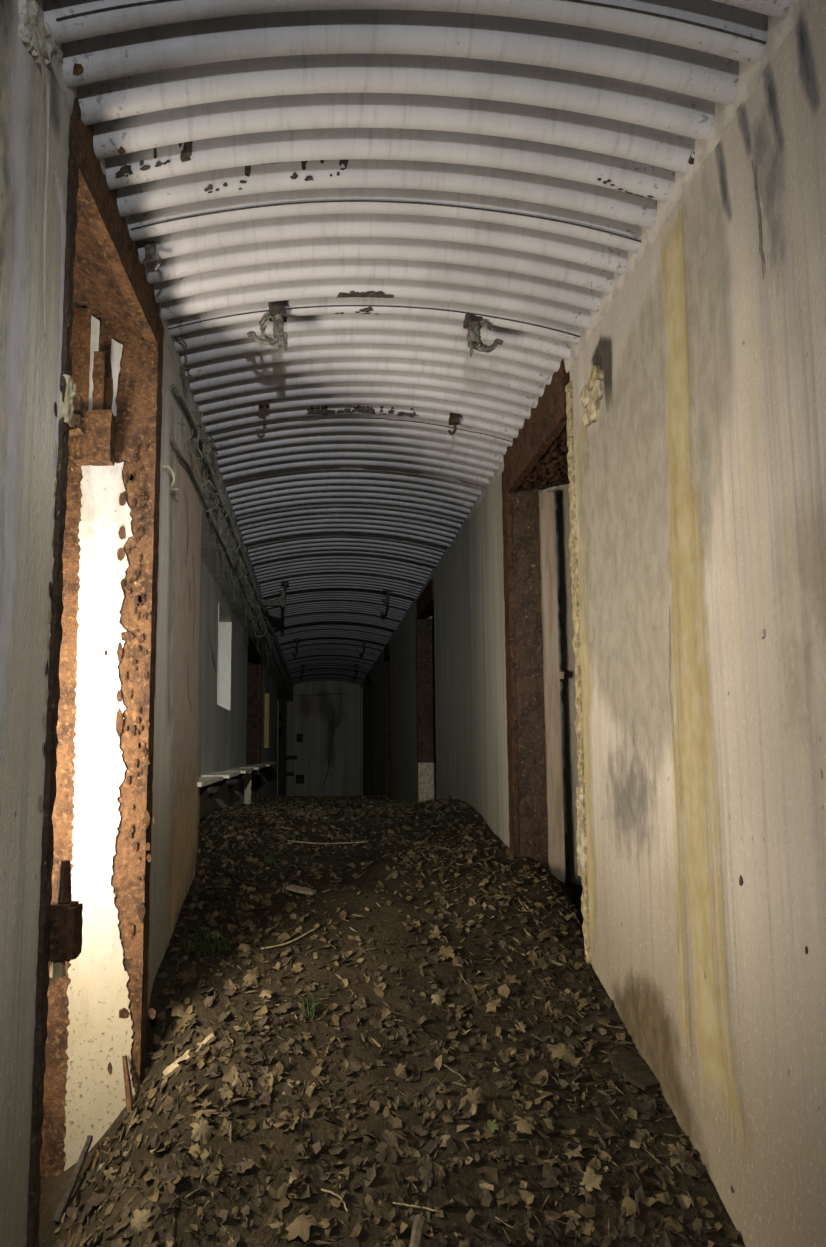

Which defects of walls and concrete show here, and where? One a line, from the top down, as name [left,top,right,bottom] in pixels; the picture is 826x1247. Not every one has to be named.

leakage [796,20,817,107]
peeling [115,141,192,178]
peeling [204,159,348,193]
leakage [716,143,730,217]
leakage [738,71,782,245]
peeling [88,315,123,416]
peeling [43,479,57,758]
leakage [578,200,739,1134]
peeling [63,436,155,1171]